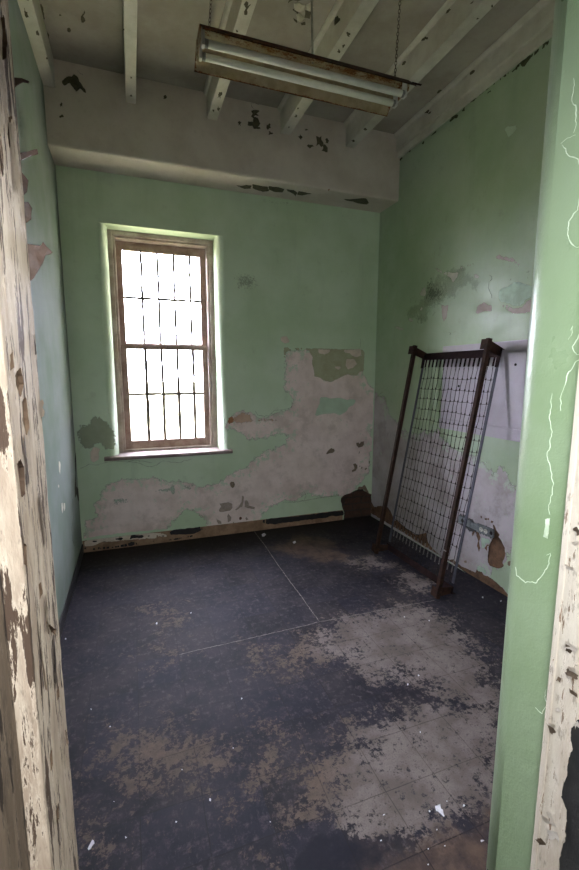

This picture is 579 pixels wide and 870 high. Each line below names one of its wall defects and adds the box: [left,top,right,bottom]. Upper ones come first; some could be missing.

peeling [62,75,86,93]
crack [562,78,579,164]
peeling [0,116,38,223]
peeling [27,243,53,281]
peeling [237,184,311,196]
crack [567,201,579,248]
peeling [503,299,531,314]
peeling [10,350,30,497]
peeling [83,349,516,597]
peeling [39,582,62,700]
peeling [556,664,578,698]
peeling [535,720,579,870]